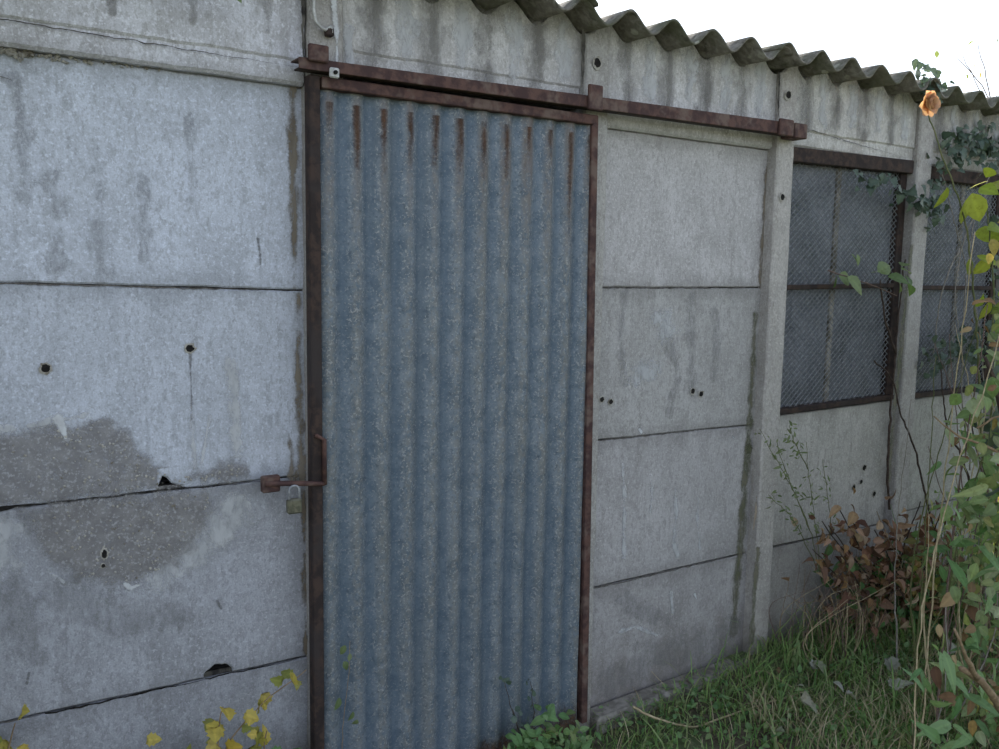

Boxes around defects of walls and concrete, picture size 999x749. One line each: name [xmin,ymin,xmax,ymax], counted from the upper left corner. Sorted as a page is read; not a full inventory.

rust [286,86,299,257]
peeling [0,412,249,590]
crack [0,481,260,512]
water stain [142,496,252,590]
rust [287,335,307,602]
crack [0,658,299,723]